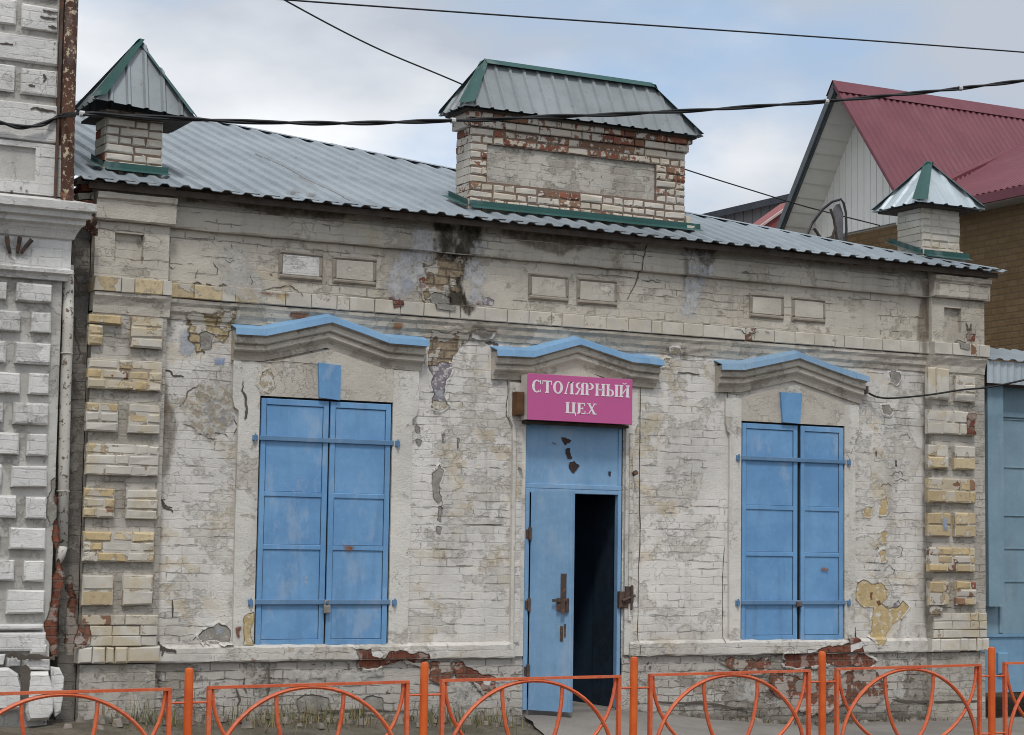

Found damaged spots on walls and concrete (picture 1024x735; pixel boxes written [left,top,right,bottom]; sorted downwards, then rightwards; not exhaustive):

peeling [180,247,265,365]
spalling [416,255,465,311]
leakage [387,223,496,339]
crack [627,245,661,299]
spalling [424,329,496,414]
peeling [428,462,446,534]
spalling [44,477,92,657]
peeling [193,612,254,647]
spalling [289,646,496,707]
spalling [719,578,911,715]